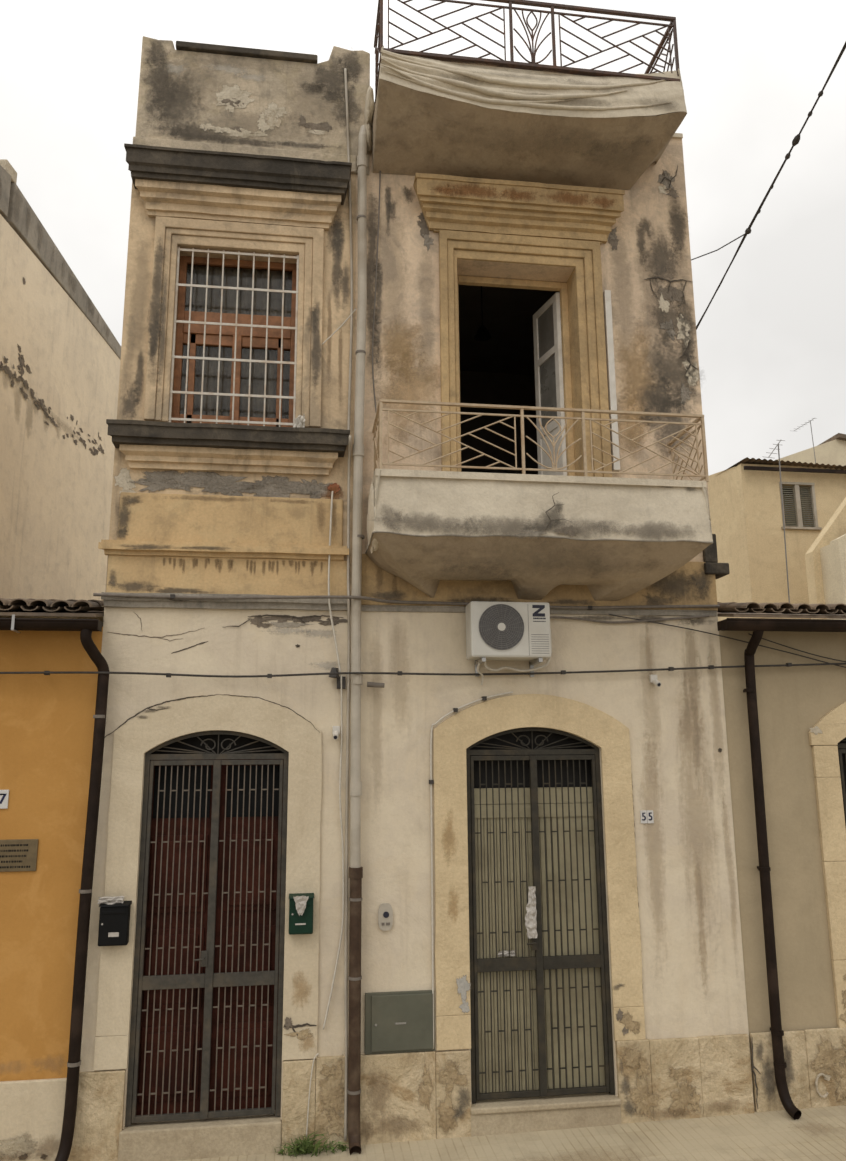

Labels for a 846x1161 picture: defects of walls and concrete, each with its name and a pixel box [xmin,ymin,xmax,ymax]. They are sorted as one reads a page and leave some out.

damp [149,43,267,146]
damp [303,54,360,119]
damp [638,207,685,280]
flaking render [657,286,691,345]
flaking render [0,344,104,455]
damp [643,299,694,446]
flaking render [680,360,699,404]
flaking render [114,467,341,499]
damp [383,504,688,539]
crack [109,597,343,654]
flaking render [248,615,348,628]